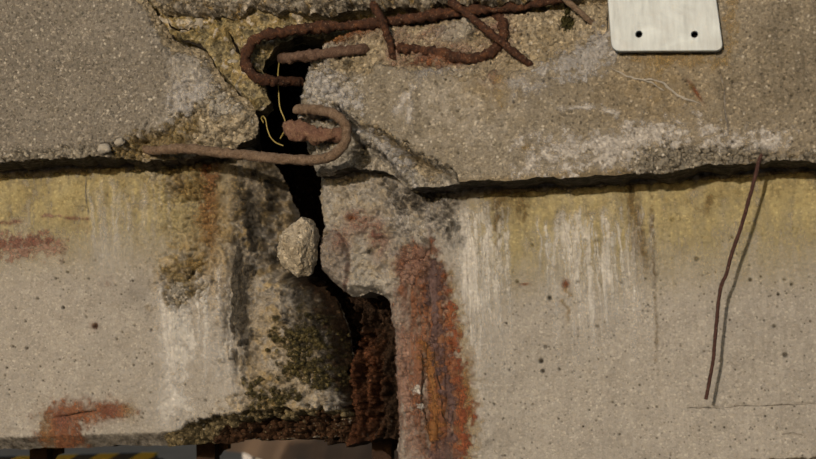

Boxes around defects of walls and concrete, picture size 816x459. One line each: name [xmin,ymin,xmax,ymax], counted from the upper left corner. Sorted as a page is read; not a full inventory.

spalling [309,0,608,83]
water stain [300,60,364,116]
spalling [303,107,459,190]
water stain [509,112,799,178]
rust [0,220,69,263]
water stain [358,128,816,343]
water stain [159,164,280,420]
water stain [280,276,355,410]
rust [38,399,138,448]
spalling [164,405,357,447]
rust [345,333,384,447]